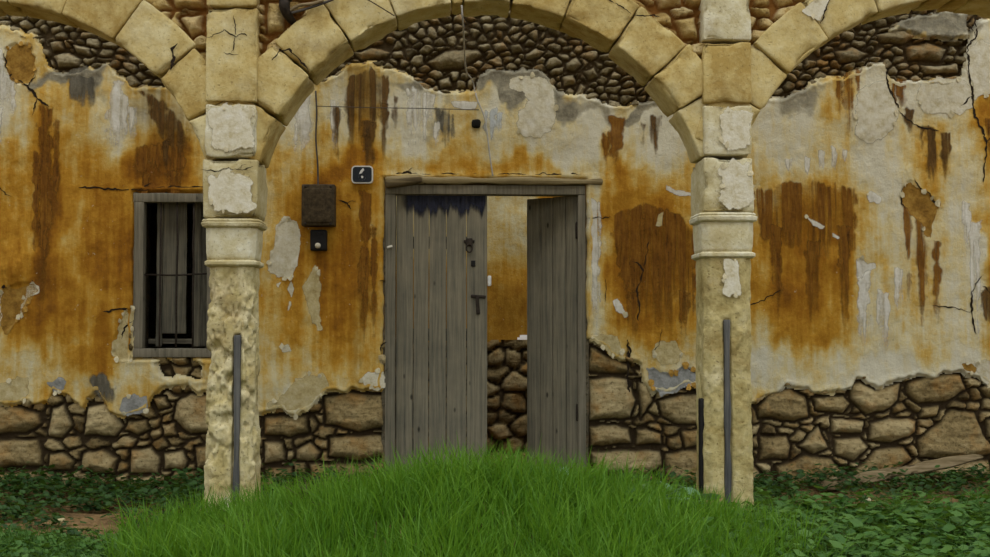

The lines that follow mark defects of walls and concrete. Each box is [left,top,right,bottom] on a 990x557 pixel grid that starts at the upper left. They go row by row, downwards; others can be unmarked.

peeling [207,103,255,152]
flaking render [509,72,559,138]
flaking render [854,81,899,143]
crack [961,18,990,182]
peeling [208,168,257,214]
flaking render [266,216,323,331]
water stain [588,198,601,304]
peeling [119,394,149,416]
flaking render [268,371,329,420]
flaking render [359,368,385,391]
flaking render [589,334,625,358]
flaking render [646,340,696,397]